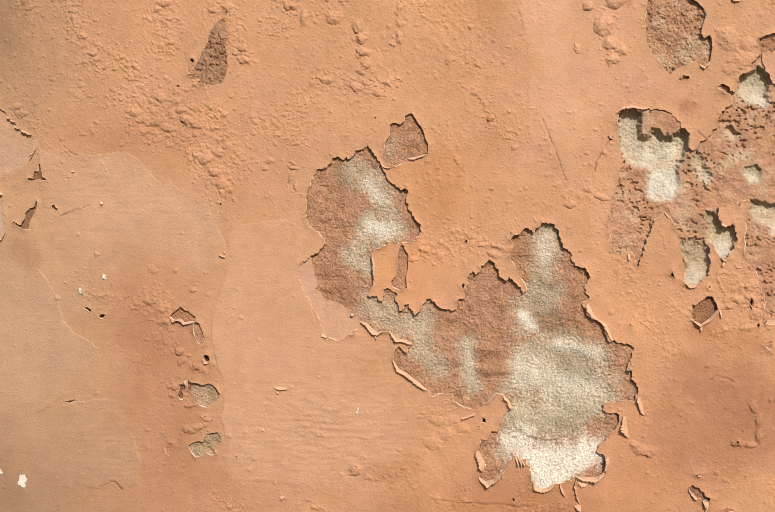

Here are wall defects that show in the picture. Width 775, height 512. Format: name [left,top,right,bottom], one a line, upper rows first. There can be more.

peeling [188,12,231,88]
peeling [645,0,712,81]
peeling [0,110,40,178]
peeling [0,192,37,240]
spalling [607,34,775,332]
peeling [169,307,209,364]
spalling [298,114,645,512]
peeling [178,380,220,421]
peeling [189,433,221,457]
peeling [688,475,710,510]